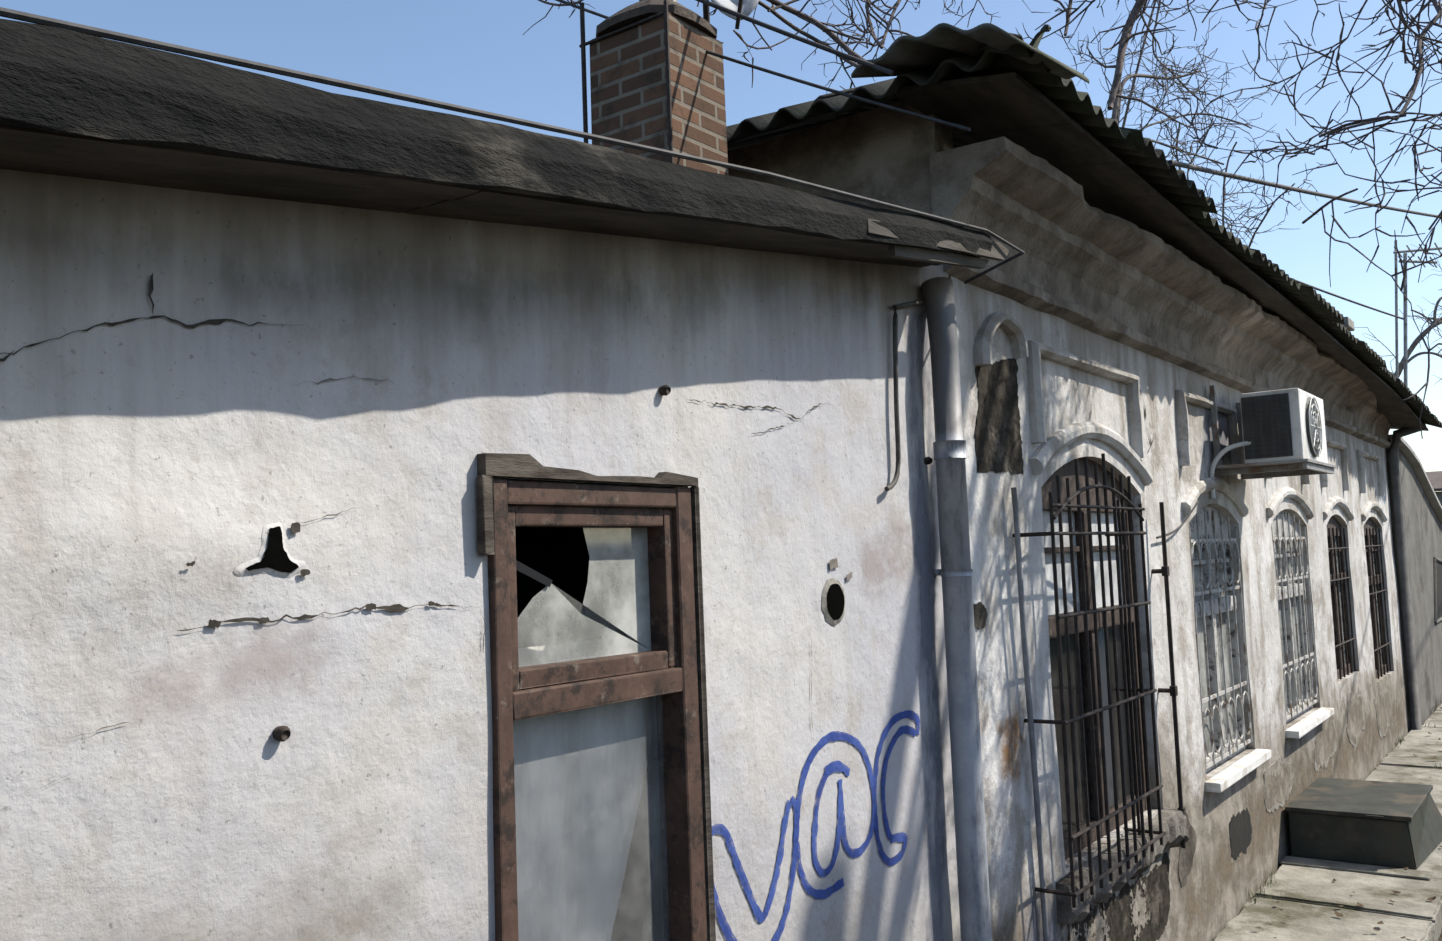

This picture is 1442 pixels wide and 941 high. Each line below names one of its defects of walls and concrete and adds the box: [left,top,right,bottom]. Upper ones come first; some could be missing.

crack [0,273,286,361]
crack [691,400,833,434]
crack [171,601,486,650]
spalling [1058,806,1197,941]